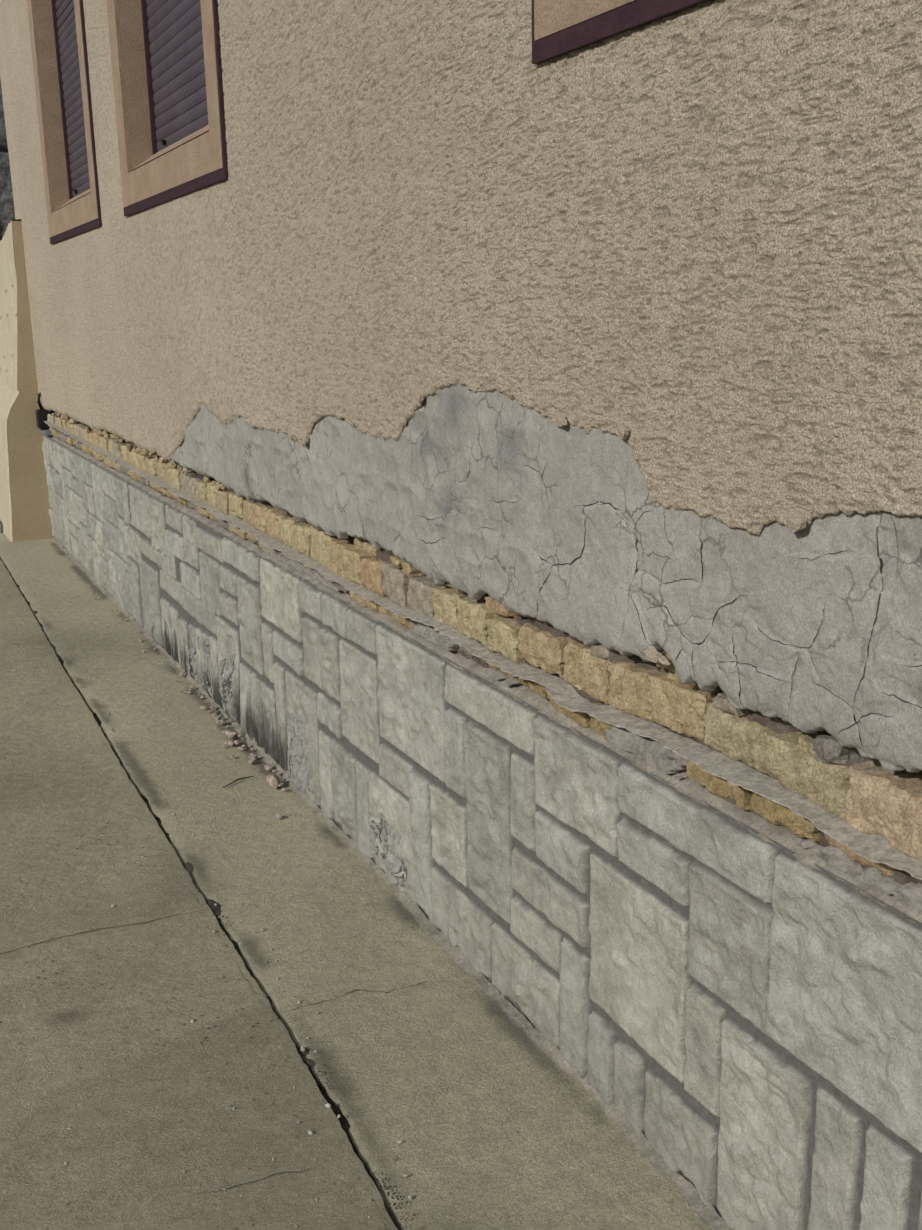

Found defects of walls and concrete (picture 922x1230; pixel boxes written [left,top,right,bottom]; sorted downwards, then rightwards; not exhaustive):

crack [393,463,545,544]
peeling [43,383,922,911]
crack [536,501,922,746]